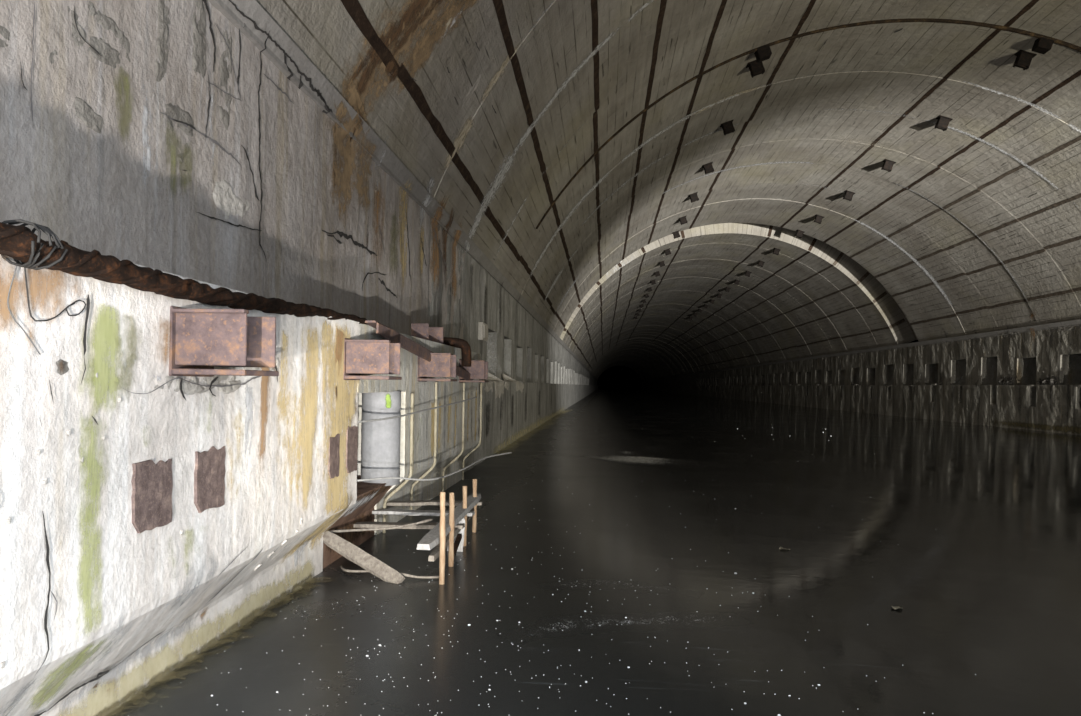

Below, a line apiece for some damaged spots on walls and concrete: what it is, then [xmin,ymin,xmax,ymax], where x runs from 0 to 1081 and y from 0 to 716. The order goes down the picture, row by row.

crack [160,0,332,261]
corrosion [331,0,476,247]
corrosion [0,270,76,322]
damp [14,643,102,706]
crack [6,511,165,716]
damp [80,422,102,628]
damp [121,324,136,386]
damp [60,539,330,716]
corrosion [260,322,390,557]
corrosion [420,198,461,296]